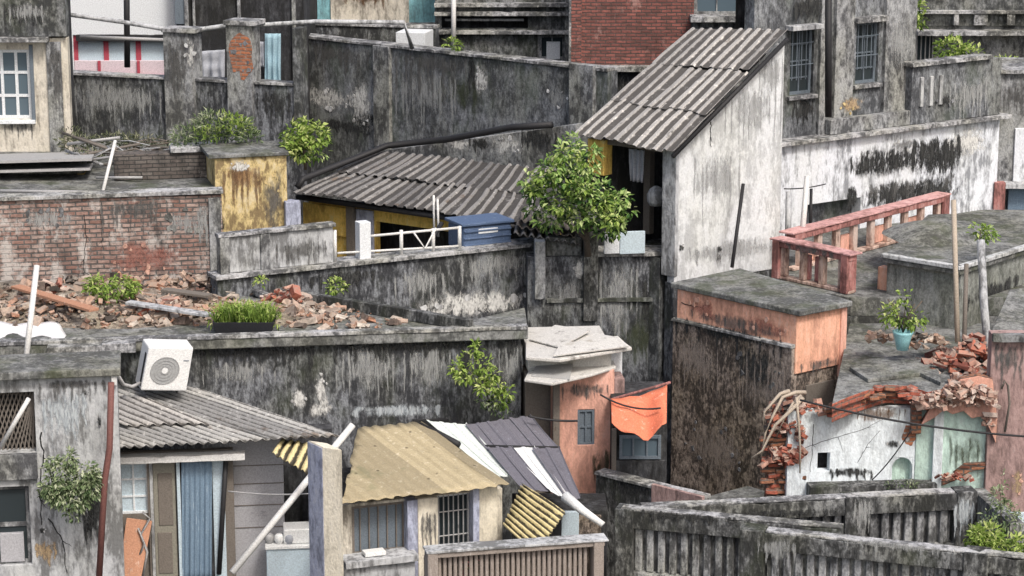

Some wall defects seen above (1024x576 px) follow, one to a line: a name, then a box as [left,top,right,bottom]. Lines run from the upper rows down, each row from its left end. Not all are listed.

spalling [229,33,253,80]
leakage [395,55,475,123]
mould [847,135,962,207]
leakage [200,346,320,385]
leakage [333,341,485,417]
leakage [675,309,784,406]
spalling [886,425,916,447]
crack [39,432,71,572]